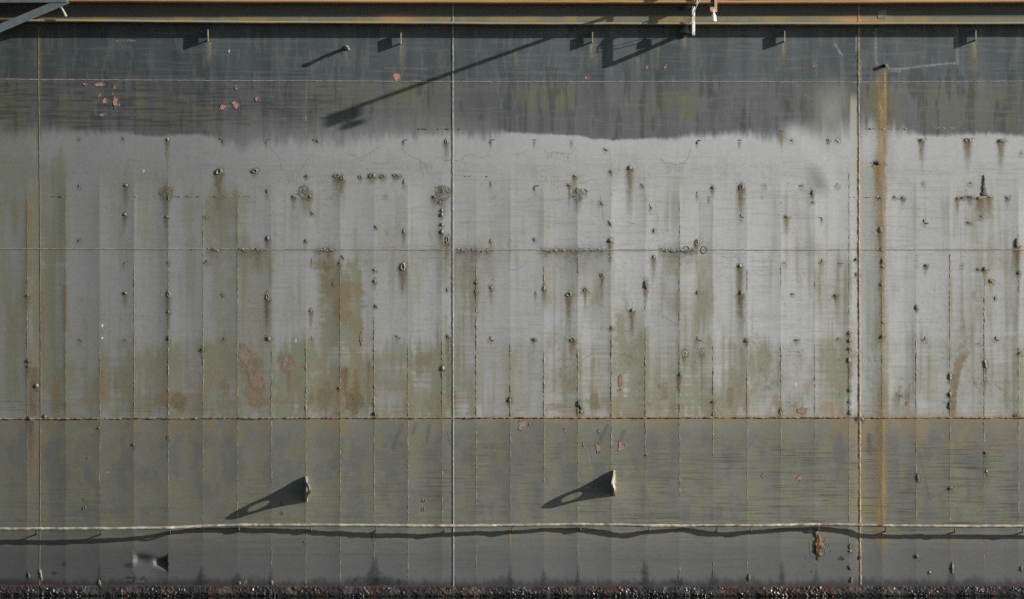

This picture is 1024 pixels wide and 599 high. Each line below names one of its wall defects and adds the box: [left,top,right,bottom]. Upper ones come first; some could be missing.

peeling [83,82,120,116]
rust [874,71,886,179]
rust [948,355,966,413]
rust [799,528,829,577]